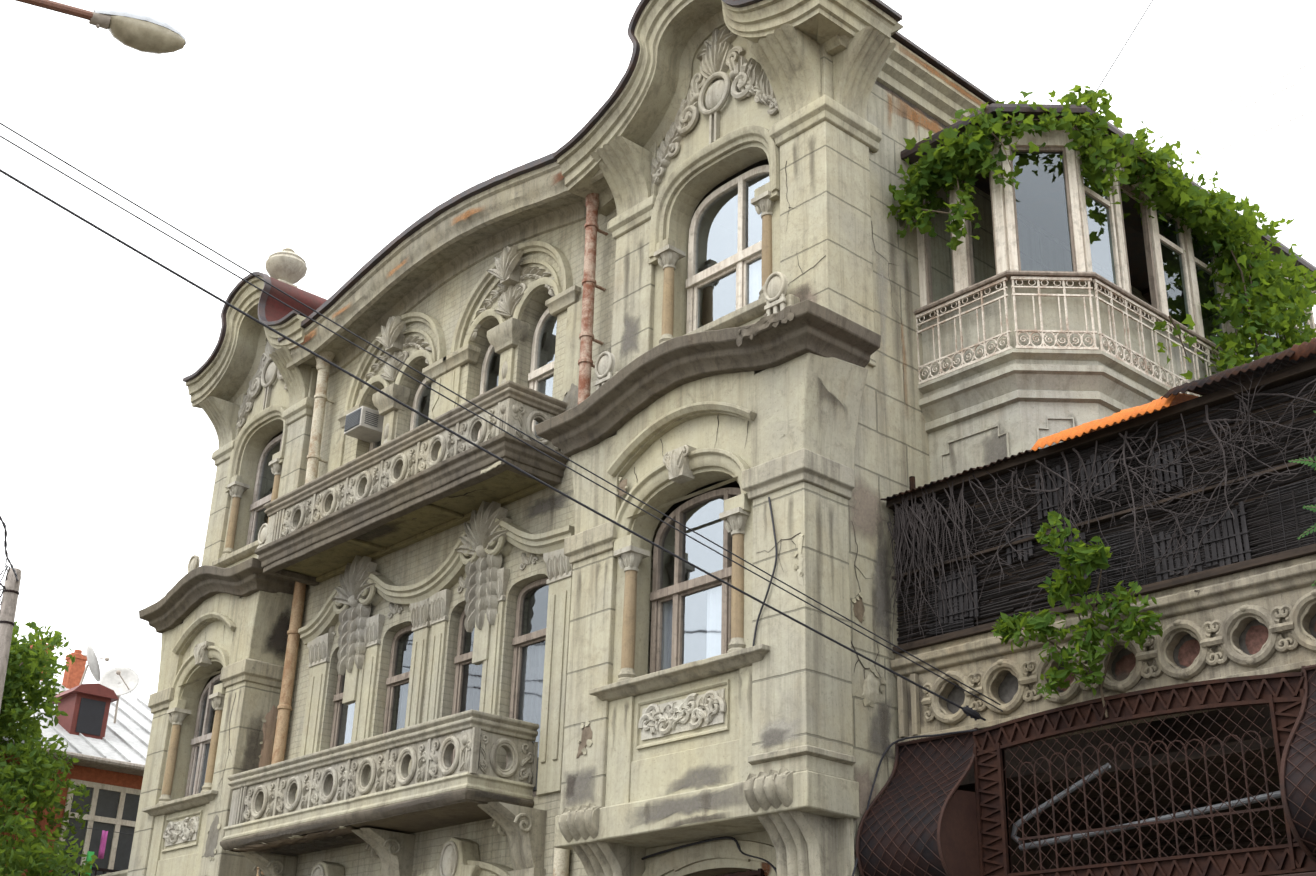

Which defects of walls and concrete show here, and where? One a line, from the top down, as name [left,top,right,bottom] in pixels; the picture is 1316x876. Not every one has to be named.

crack [785,161,826,285]
damp [853,486,889,633]
damp [268,613,290,656]
damp [242,726,262,772]
damp [640,768,737,826]